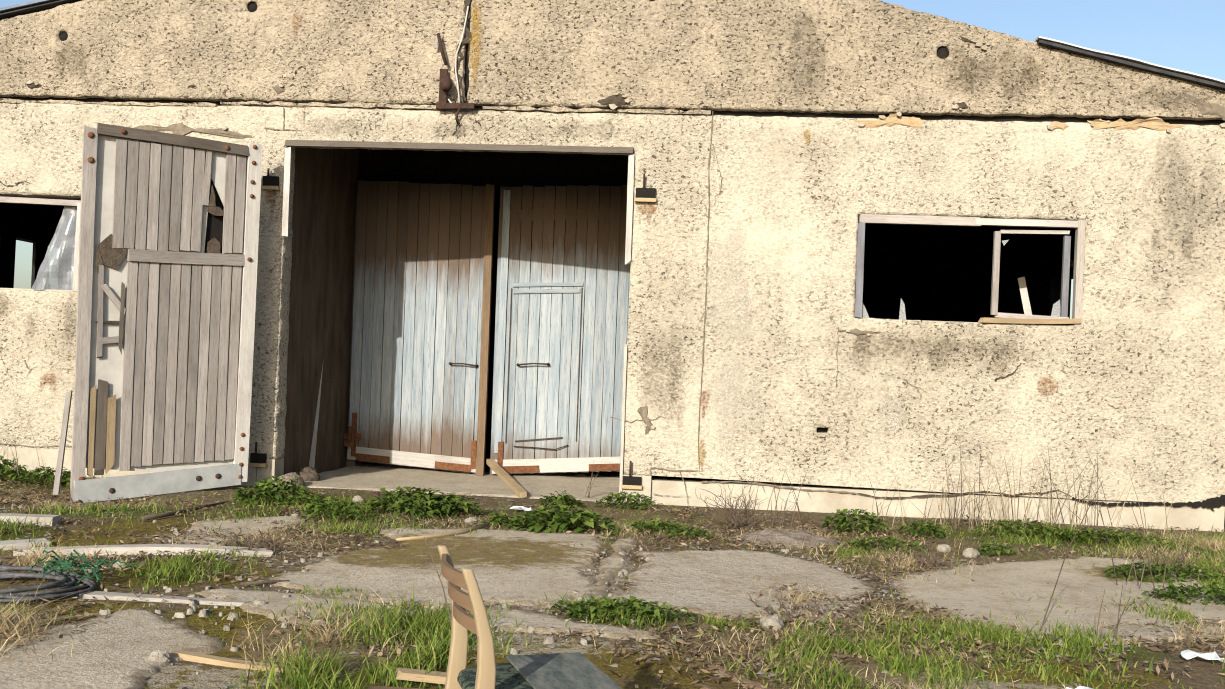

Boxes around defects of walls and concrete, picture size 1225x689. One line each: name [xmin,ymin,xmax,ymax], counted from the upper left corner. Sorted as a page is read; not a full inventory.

spalling [1182,91,1225,129]
spalling [854,112,924,128]
spalling [1047,121,1069,130]
spalling [1088,117,1184,133]
crack [650,111,1225,511]